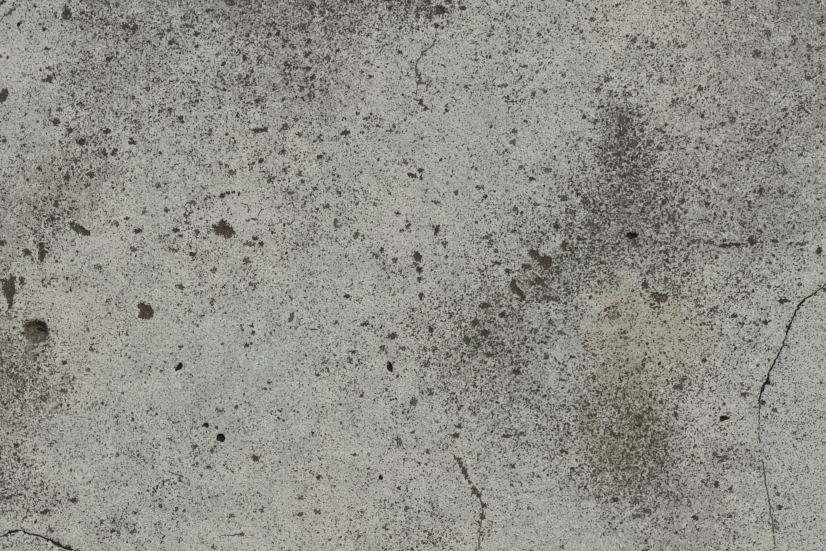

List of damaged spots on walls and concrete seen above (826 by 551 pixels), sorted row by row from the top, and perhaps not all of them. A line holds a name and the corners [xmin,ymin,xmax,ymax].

crack [0,508,78,551]
crack [757,284,826,551]